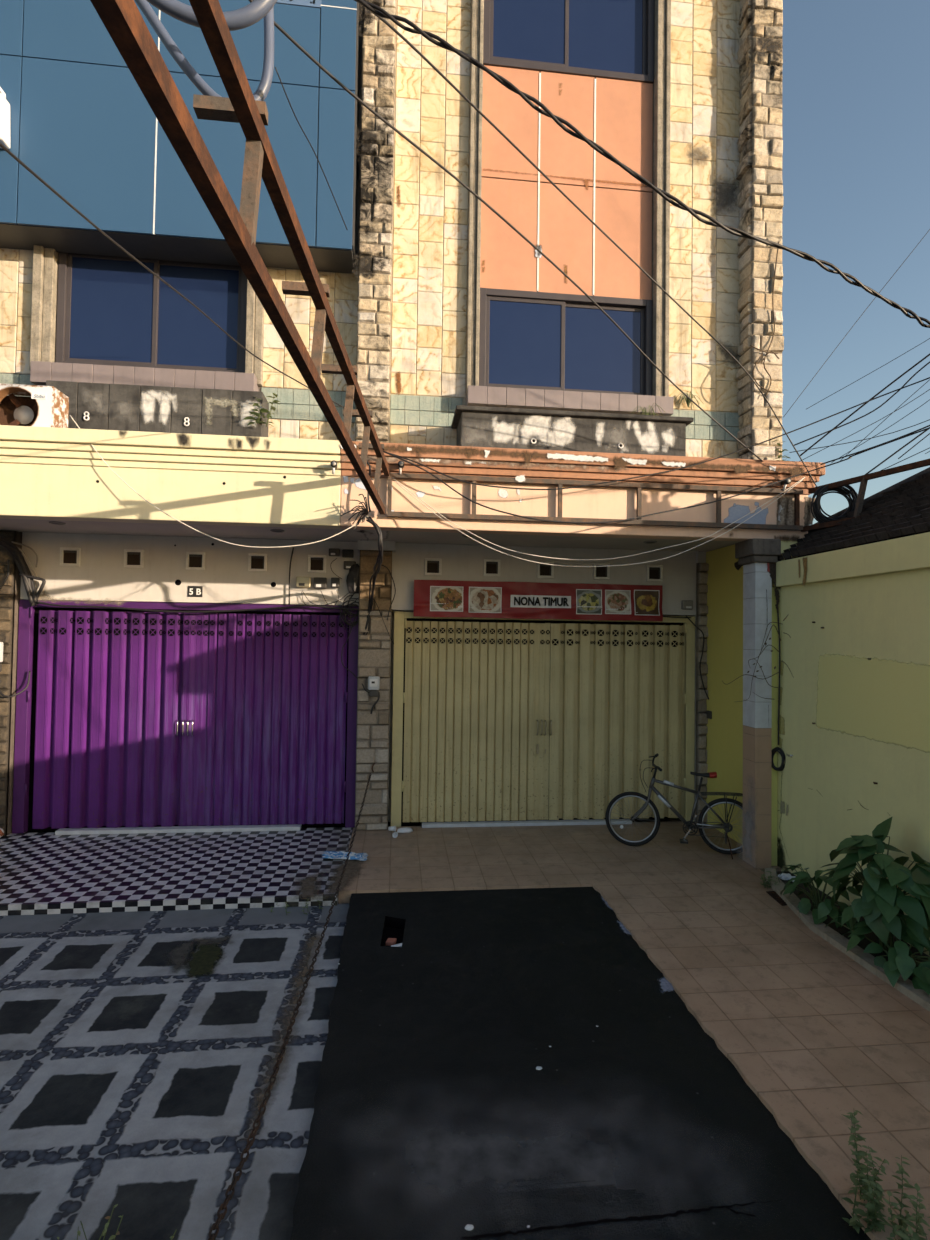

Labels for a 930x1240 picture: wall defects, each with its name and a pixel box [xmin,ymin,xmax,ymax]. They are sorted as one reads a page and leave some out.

water stain [358,0,386,36]
water stain [356,122,381,162]
water stain [352,251,390,277]
peeling [142,391,176,424]
peeling [469,415,608,465]
peeling [622,421,686,467]
crack [461,1200,780,1239]